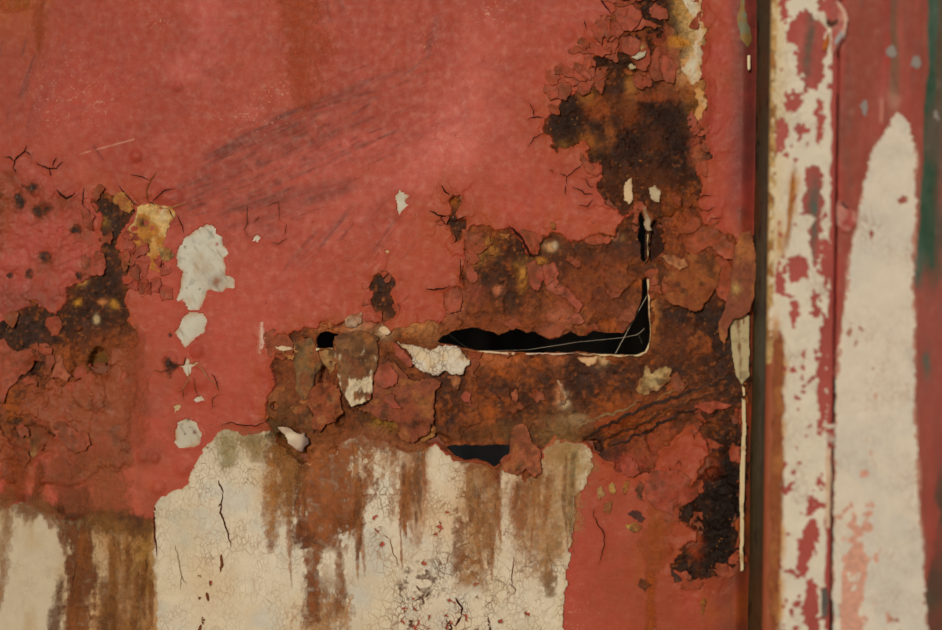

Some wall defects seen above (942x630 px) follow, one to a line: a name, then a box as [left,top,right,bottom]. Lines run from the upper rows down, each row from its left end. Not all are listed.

crack [5,146,84,205]
rust [0,183,138,468]
rust [165,358,178,374]
peeling [113,192,235,376]
rust [263,0,751,630]
rust [17,496,153,630]
crack [137,507,209,630]
crack [218,480,231,572]